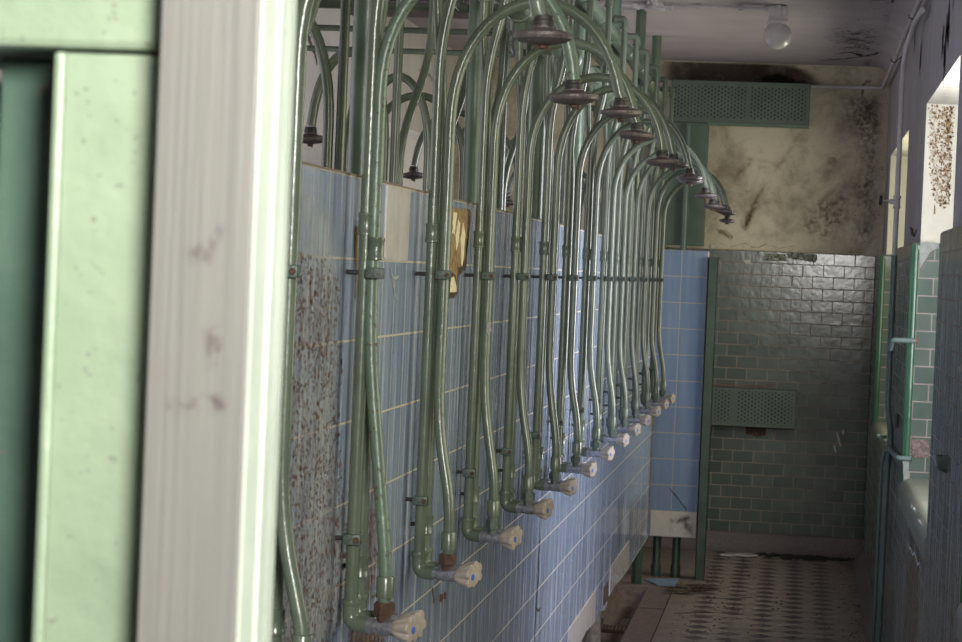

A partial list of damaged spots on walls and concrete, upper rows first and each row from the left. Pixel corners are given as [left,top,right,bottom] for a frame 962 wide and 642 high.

corrosion [290,199,347,642]